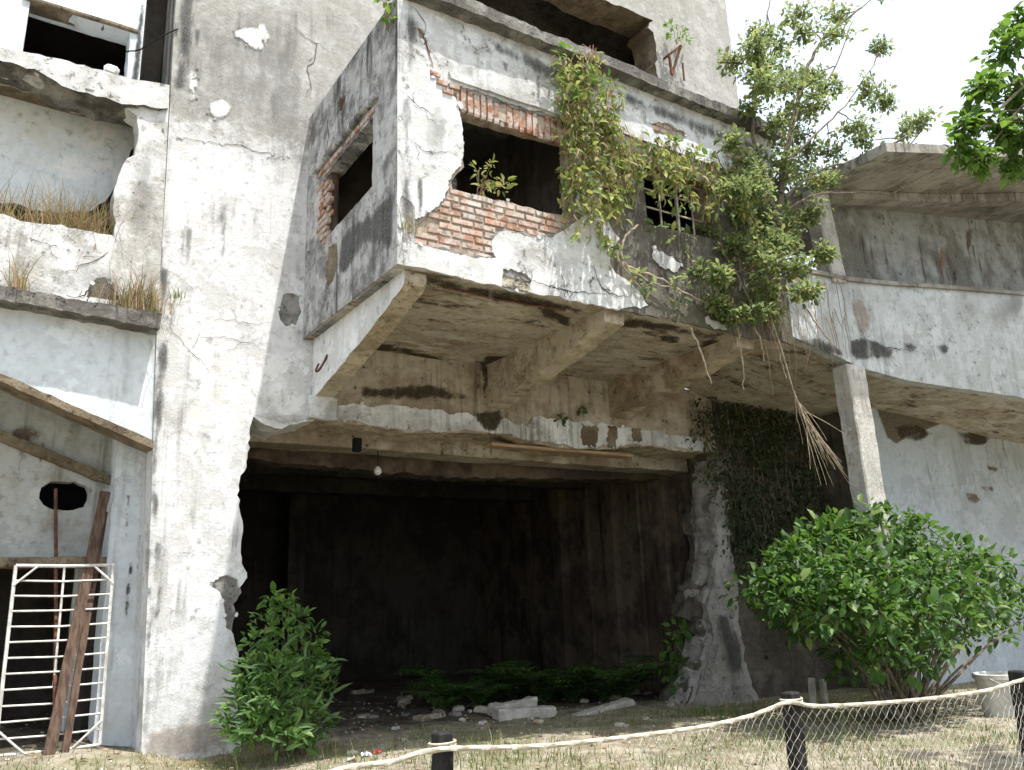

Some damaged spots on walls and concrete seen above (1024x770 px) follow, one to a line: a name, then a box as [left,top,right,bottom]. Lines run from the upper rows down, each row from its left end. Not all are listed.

peeling [233,24,269,50]
crack [294,27,325,98]
spalling [430,68,572,148]
spalling [316,106,375,289]
damp [337,194,392,290]
spalling [415,188,585,257]
spalling [278,294,303,328]
damp [800,338,892,359]
damp [362,385,466,400]
peeling [337,402,704,452]
peeling [879,411,940,443]
spalling [210,575,242,630]